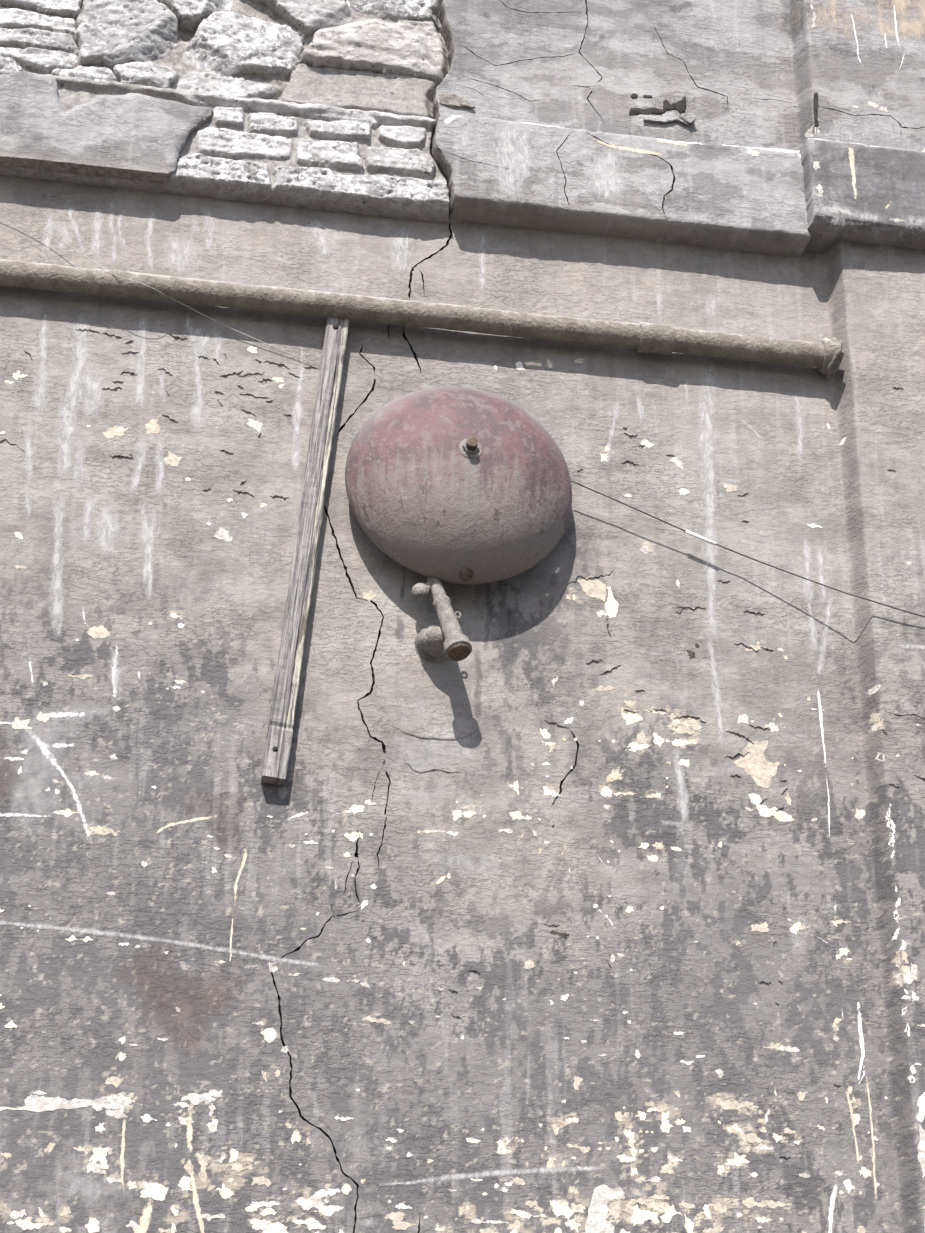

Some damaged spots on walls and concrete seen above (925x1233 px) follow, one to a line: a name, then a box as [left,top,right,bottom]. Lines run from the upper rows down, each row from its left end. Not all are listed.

crack [443,0,679,219]
crack [649,23,925,140]
crack [333,222,457,440]
crack [547,724,584,809]
peeling [599,700,702,809]
peeling [733,713,802,822]
crack [264,496,461,1233]
peeling [0,1076,223,1133]
peeling [72,1146,366,1233]
peeling [459,1105,790,1233]
peeling [715,1090,801,1178]
peeling [907,1062,925,1178]